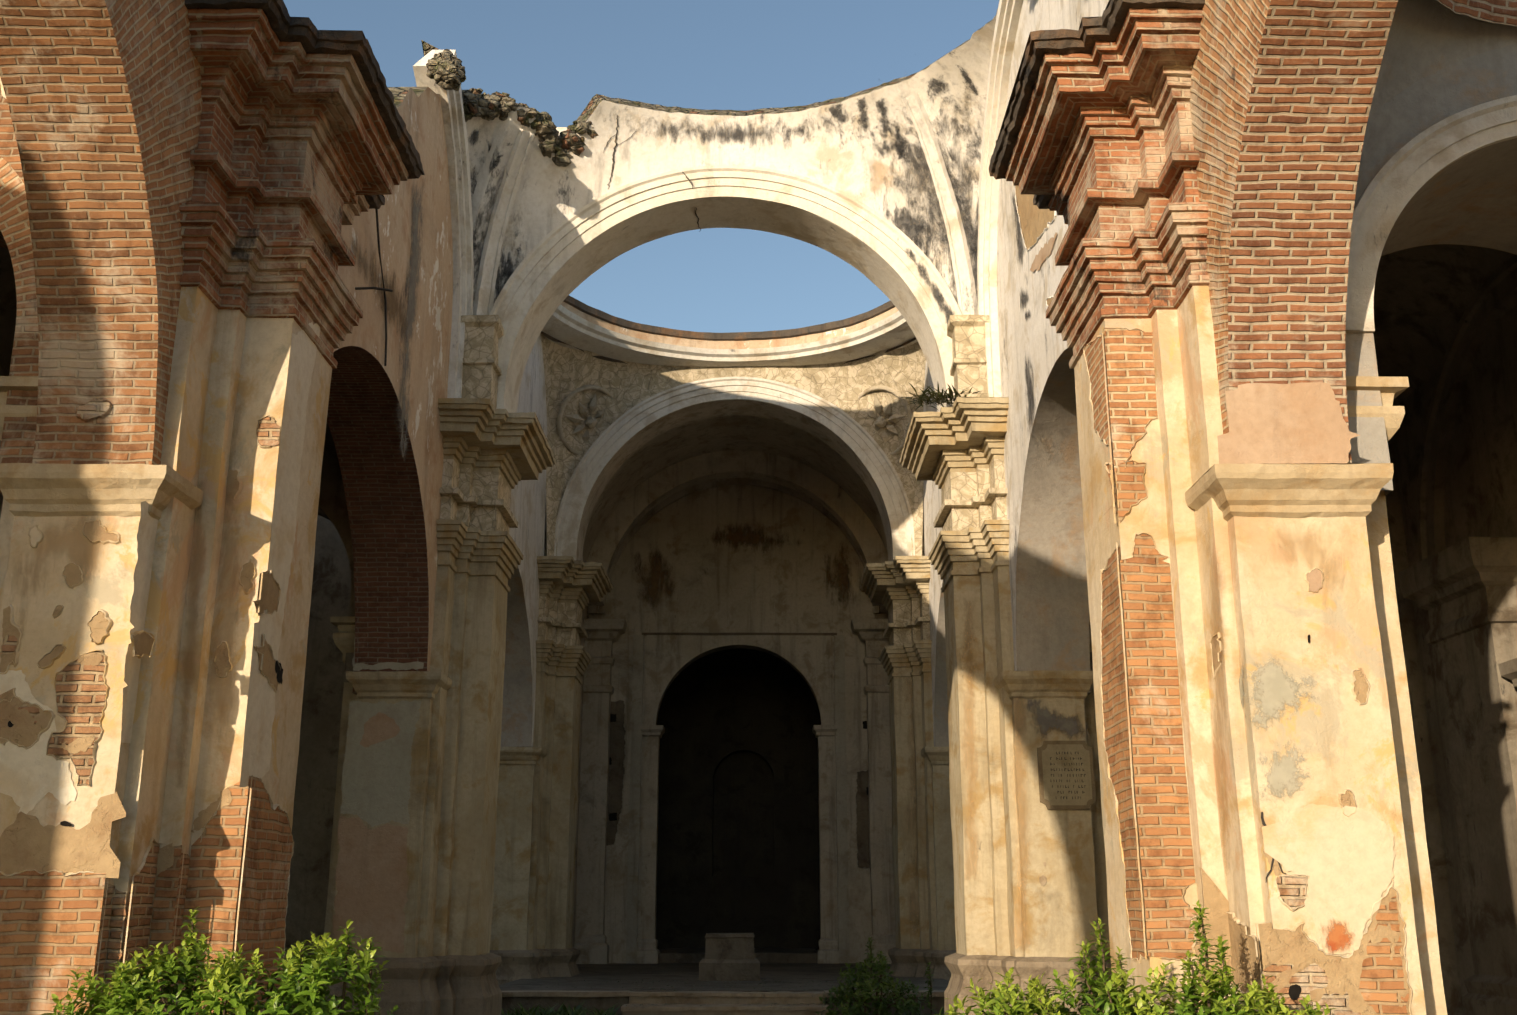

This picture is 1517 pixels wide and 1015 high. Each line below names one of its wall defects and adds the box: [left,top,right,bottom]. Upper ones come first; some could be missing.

leakage [655,66,982,324]
flaking render [256,415,280,449]
flaking render [0,604,113,787]
peeling [239,559,281,616]
flaking render [254,634,283,692]
leakage [714,525,799,550]
flaking render [1083,327,1412,1015]
flaking render [0,775,294,1015]